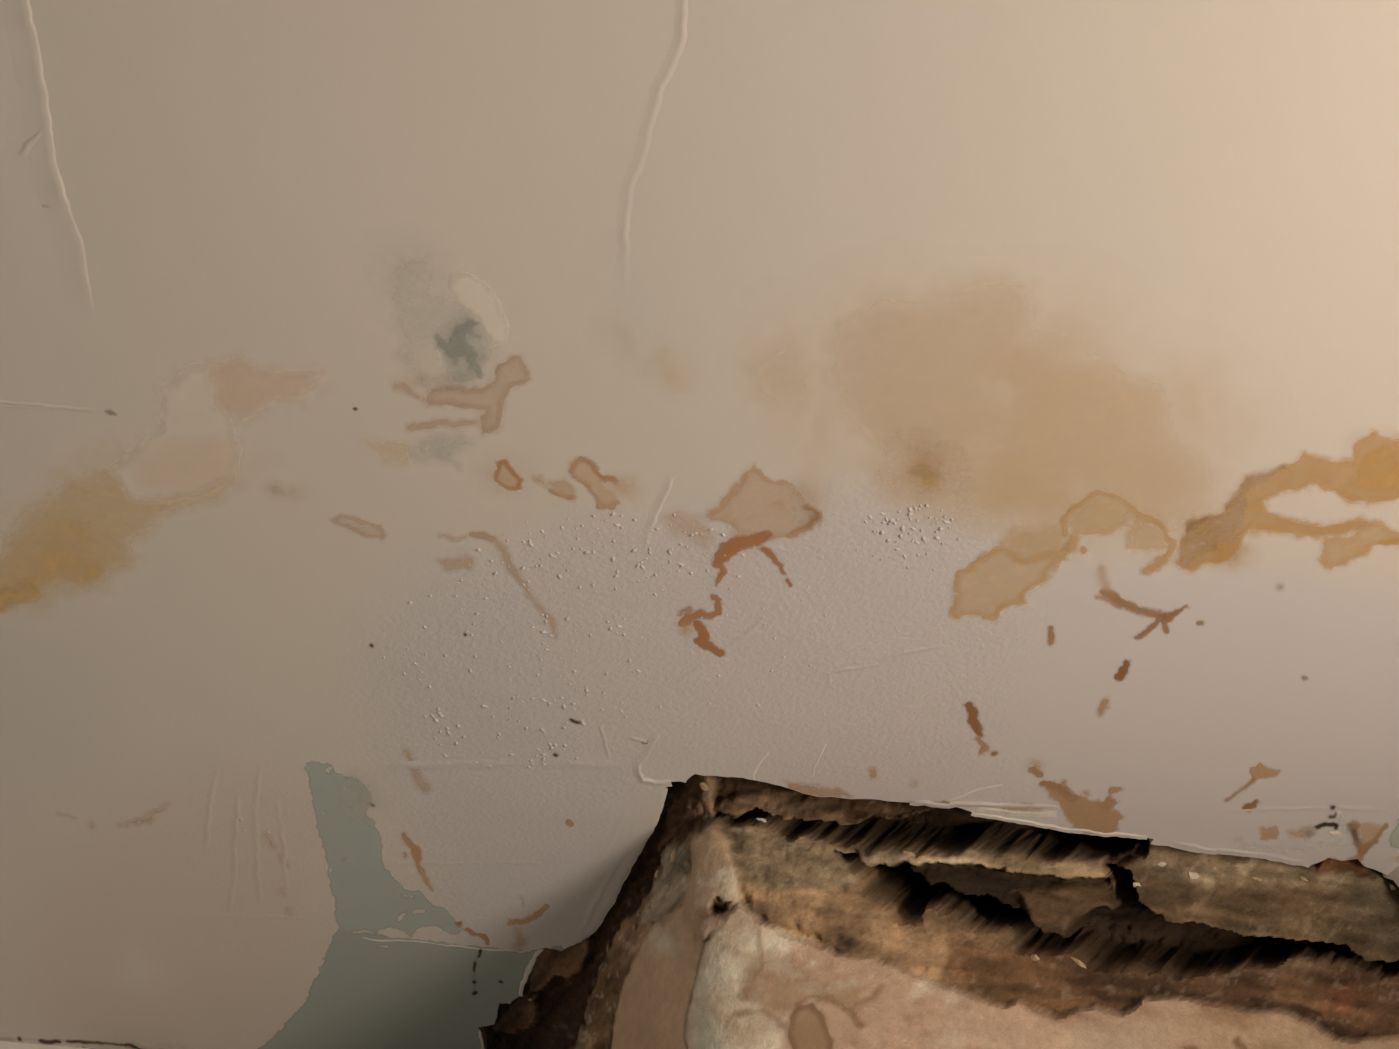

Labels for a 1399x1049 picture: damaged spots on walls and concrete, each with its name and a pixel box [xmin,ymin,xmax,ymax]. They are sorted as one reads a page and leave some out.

damp [0,362,313,610]
damp [411,357,530,433]
damp [494,460,523,490]
damp [549,457,619,509]
damp [849,296,1399,620]
spalling [259,730,1399,1049]